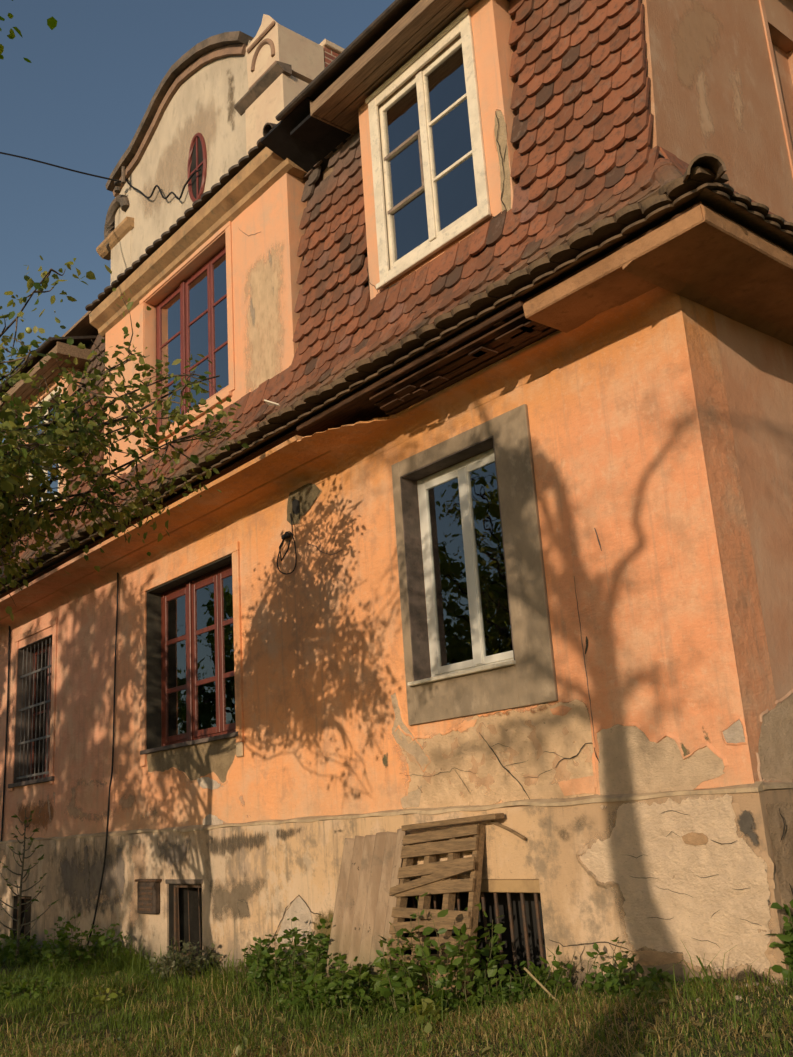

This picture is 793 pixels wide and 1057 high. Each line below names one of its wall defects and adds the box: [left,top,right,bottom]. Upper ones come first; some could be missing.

damp [245,247,283,390]
crack [479,578,600,799]
spalling [146,737,237,790]
damp [158,840,189,866]
damp [206,829,300,854]
spalling [383,689,793,979]
damp [737,810,758,846]
damp [52,845,125,916]
damp [210,879,264,919]